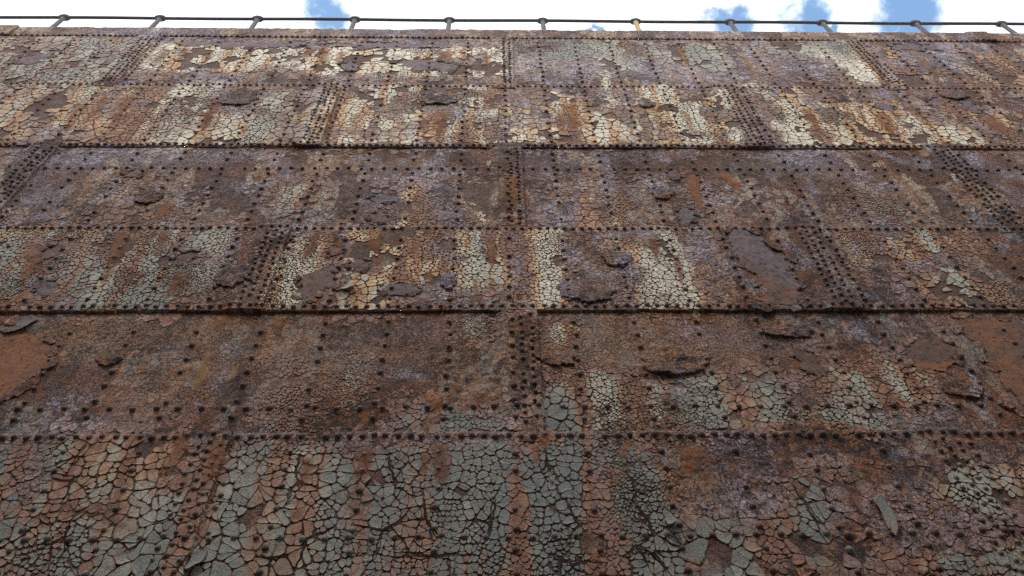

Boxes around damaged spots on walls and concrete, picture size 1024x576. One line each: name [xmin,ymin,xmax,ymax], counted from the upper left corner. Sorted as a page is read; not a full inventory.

peeling [0,35,1024,161]
peeling [0,162,1024,576]
crack [55,444,87,491]
crack [288,461,308,501]
crack [41,521,72,558]
crack [256,523,315,572]
crack [364,453,457,572]
crack [469,497,496,535]
crack [561,501,588,532]
crack [553,554,601,572]
crack [623,470,666,569]
crack [792,482,820,528]